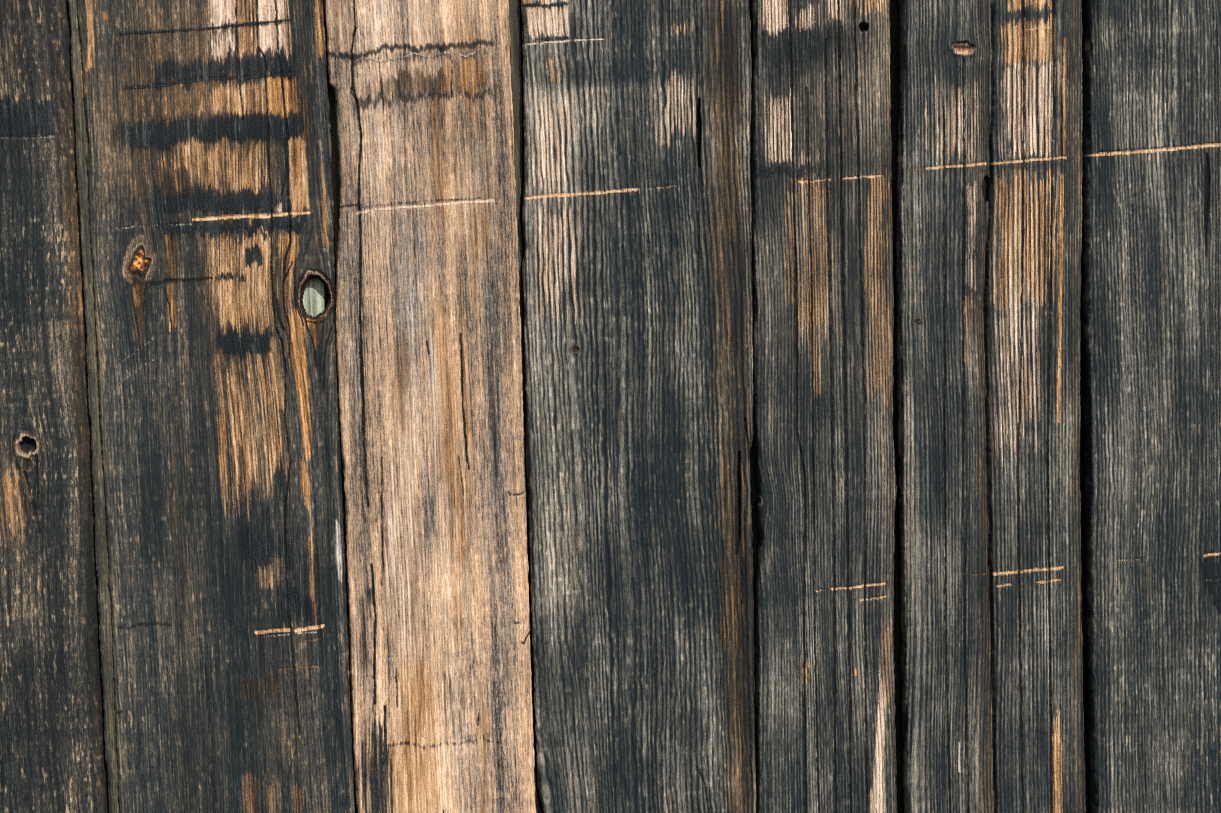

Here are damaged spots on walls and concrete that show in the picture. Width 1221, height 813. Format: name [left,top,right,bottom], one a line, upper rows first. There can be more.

crack [235,0,412,813]
crack [458,333,469,501]
crack [735,419,750,604]